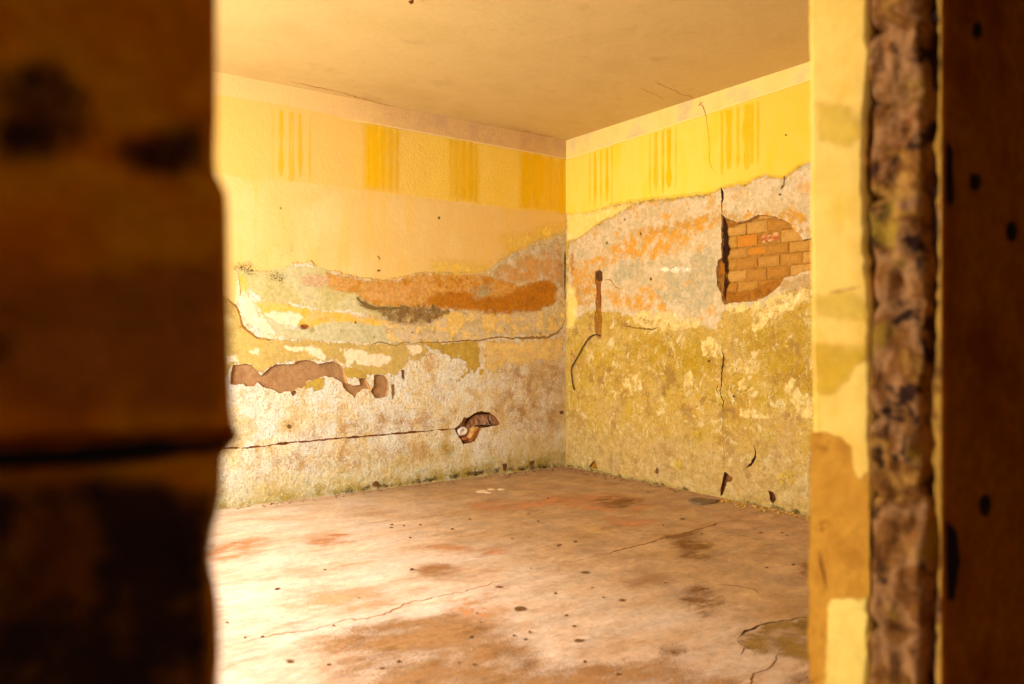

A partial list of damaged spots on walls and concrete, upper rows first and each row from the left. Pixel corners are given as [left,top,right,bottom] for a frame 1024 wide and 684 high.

damp [360,122,404,194]
damp [649,127,677,194]
damp [720,101,761,174]
peeling [229,161,812,398]
flaking render [455,411,500,444]
crack [221,579,505,648]
damp [407,562,463,579]
damp [263,582,810,684]
damp [616,570,731,621]